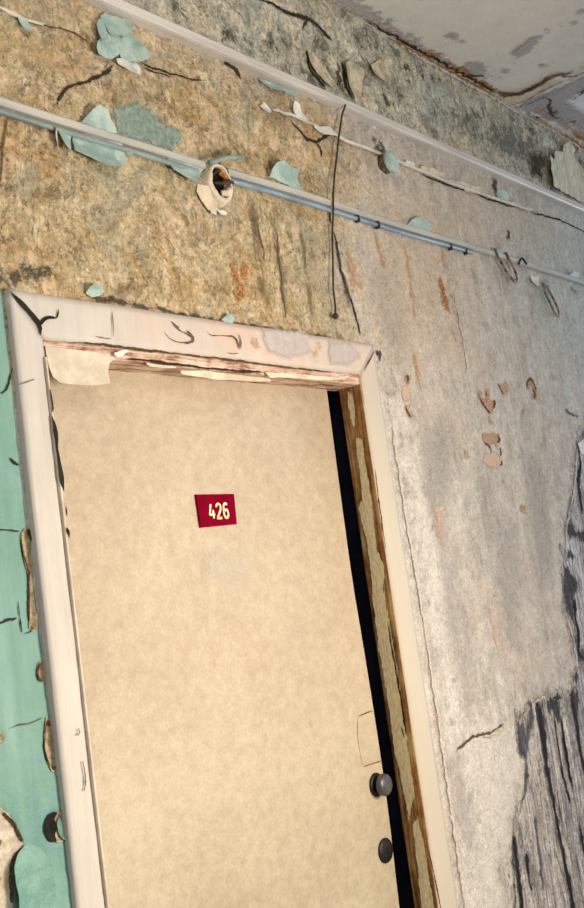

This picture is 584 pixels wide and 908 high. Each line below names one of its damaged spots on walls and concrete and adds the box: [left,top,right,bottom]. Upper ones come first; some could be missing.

crack [57,66,112,104]
peeling [97,13,153,75]
crack [260,0,353,99]
rust [327,0,583,99]
crack [372,23,584,125]
water stain [431,97,543,179]
rust [532,110,584,149]
rust [230,262,249,302]
peeling [45,330,358,386]
flaking render [505,418,584,908]
crack [457,724,506,750]
flaking render [0,807,56,908]